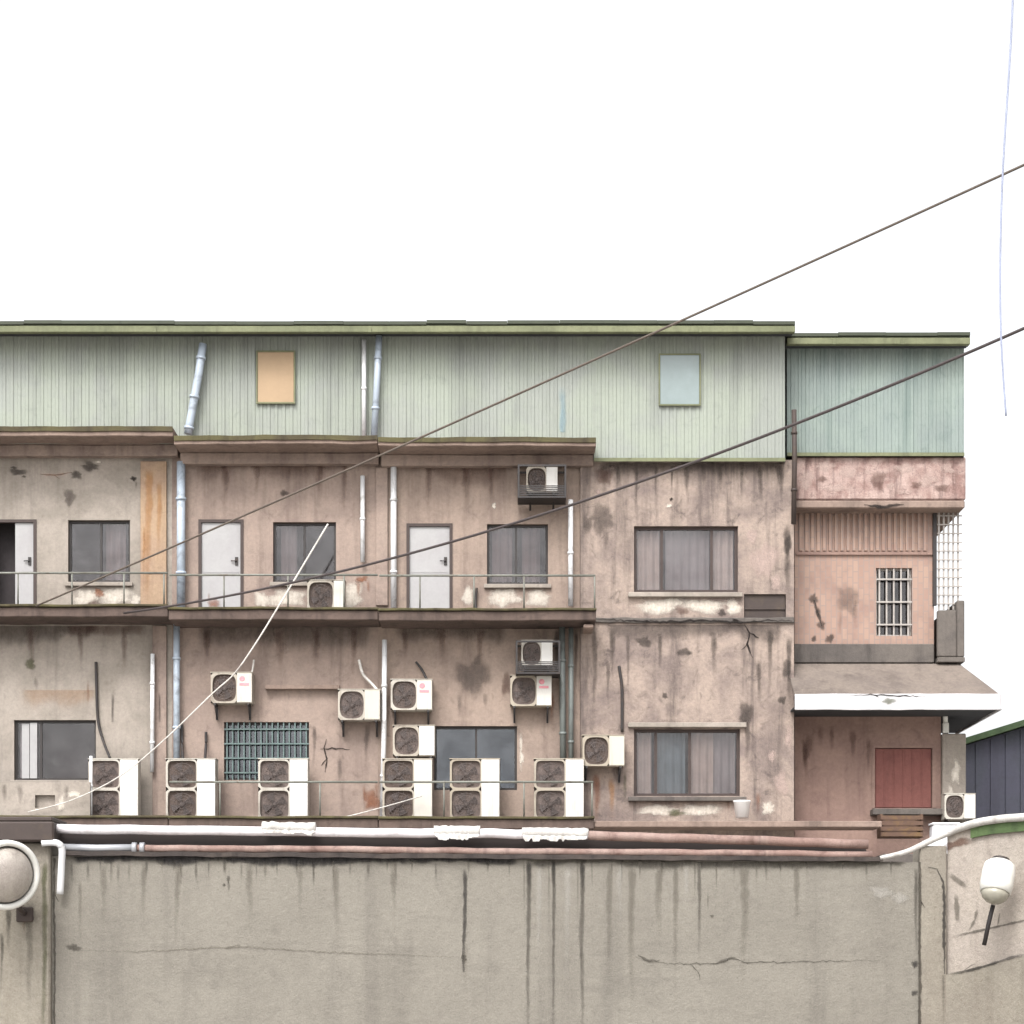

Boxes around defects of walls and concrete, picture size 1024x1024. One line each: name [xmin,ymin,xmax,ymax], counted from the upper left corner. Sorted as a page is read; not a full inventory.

peeling [462,588,472,604]
peeling [490,588,548,607]
peeling [642,599,740,616]
water stain [811,596,833,642]
crack [606,618,790,658]
crack [321,739,350,771]
crack [638,955,879,977]